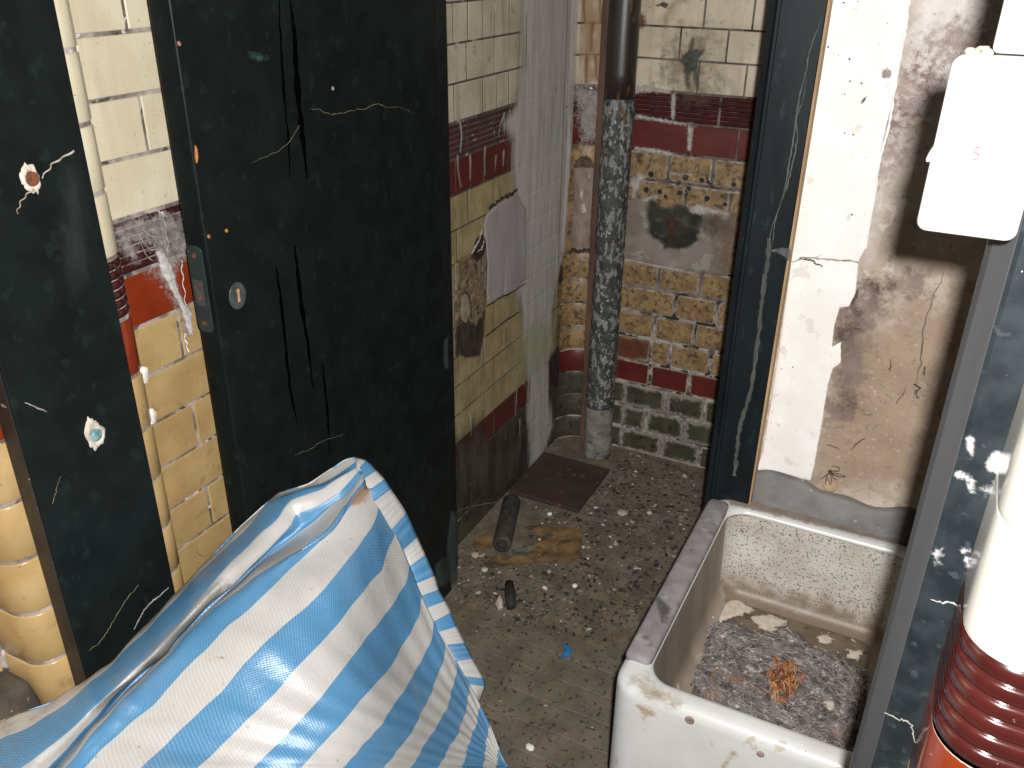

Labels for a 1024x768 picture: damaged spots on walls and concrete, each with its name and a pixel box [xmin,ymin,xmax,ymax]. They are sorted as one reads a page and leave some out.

crack [279,0,308,178]
crack [275,245,330,451]
spalling [453,230,526,358]
spalling [489,189,518,211]
water stain [457,0,598,492]
crack [732,15,859,476]
peeling [758,0,911,480]
water stain [814,267,961,485]
water stain [878,16,967,178]
crack [913,272,944,399]